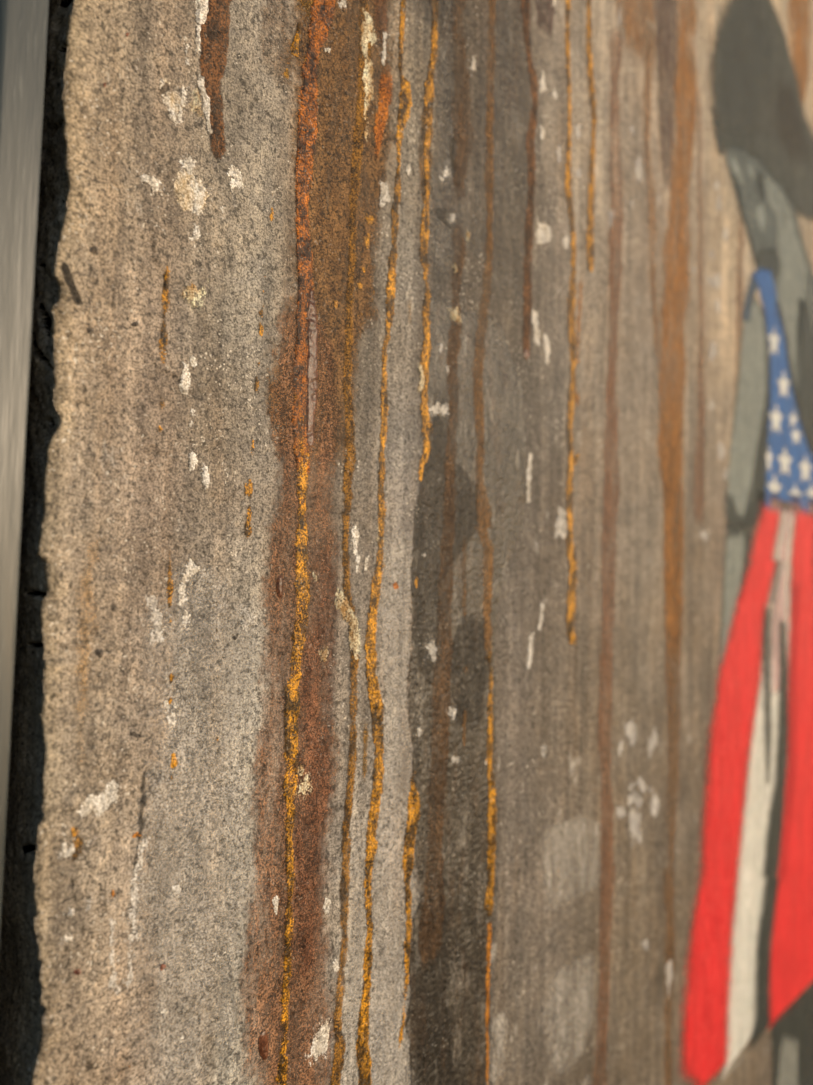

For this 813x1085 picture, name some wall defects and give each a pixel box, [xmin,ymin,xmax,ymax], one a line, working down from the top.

corrosion [199,0,232,158]
corrosion [245,0,438,1085]
leakage [343,0,527,1085]
corrosion [565,0,597,645]